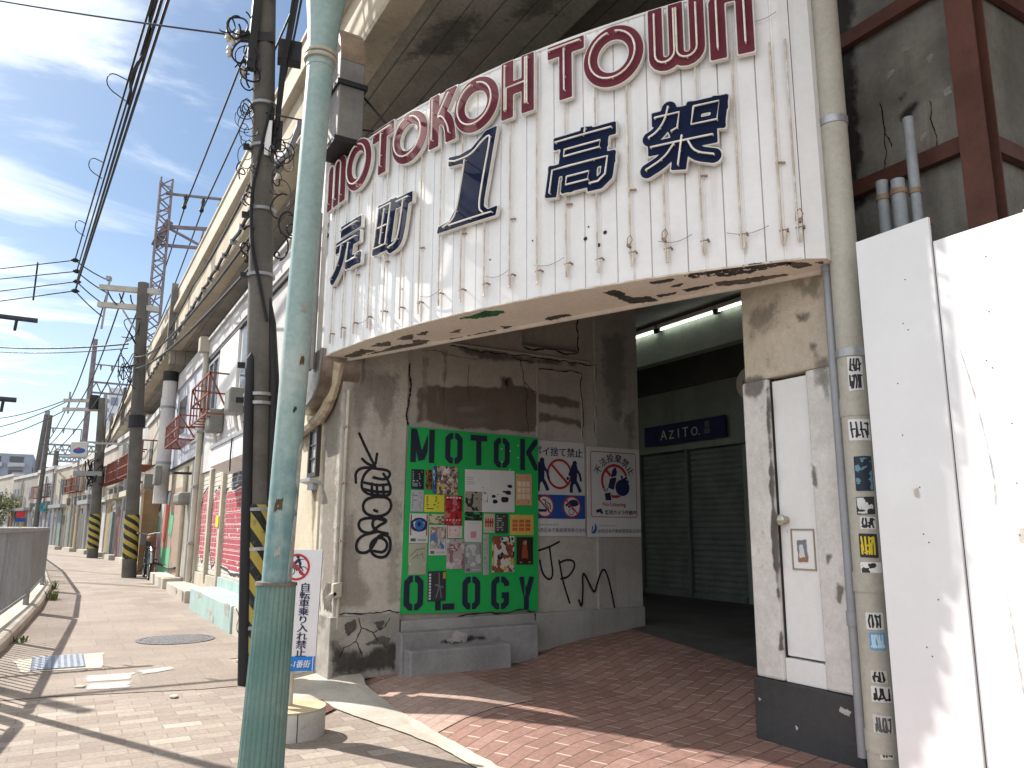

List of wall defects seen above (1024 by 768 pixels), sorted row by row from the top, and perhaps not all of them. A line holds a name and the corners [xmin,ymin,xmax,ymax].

crack [879,102,892,209]
peeling [344,331,430,358]
peeling [450,310,512,339]
water stain [417,377,581,432]
crack [405,319,596,438]
water stain [745,377,780,598]
crack [339,610,399,658]